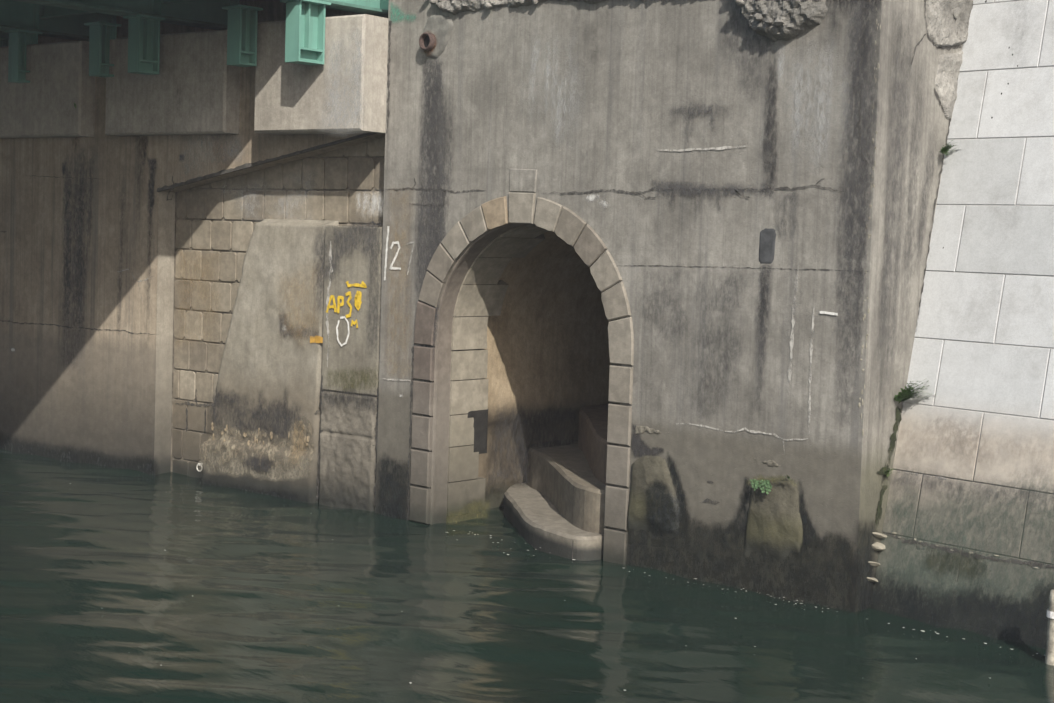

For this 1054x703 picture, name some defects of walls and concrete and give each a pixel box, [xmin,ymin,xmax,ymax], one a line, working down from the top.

spalling [426,0,607,15]
spalling [735,0,828,42]
spalling [924,0,987,120]
water stain [417,61,452,348]
crack [542,179,846,199]
water stain [655,63,781,197]
water stain [826,0,877,351]
water stain [881,82,929,333]
water stain [210,389,301,437]
crack [676,423,808,449]
water stain [628,519,859,613]